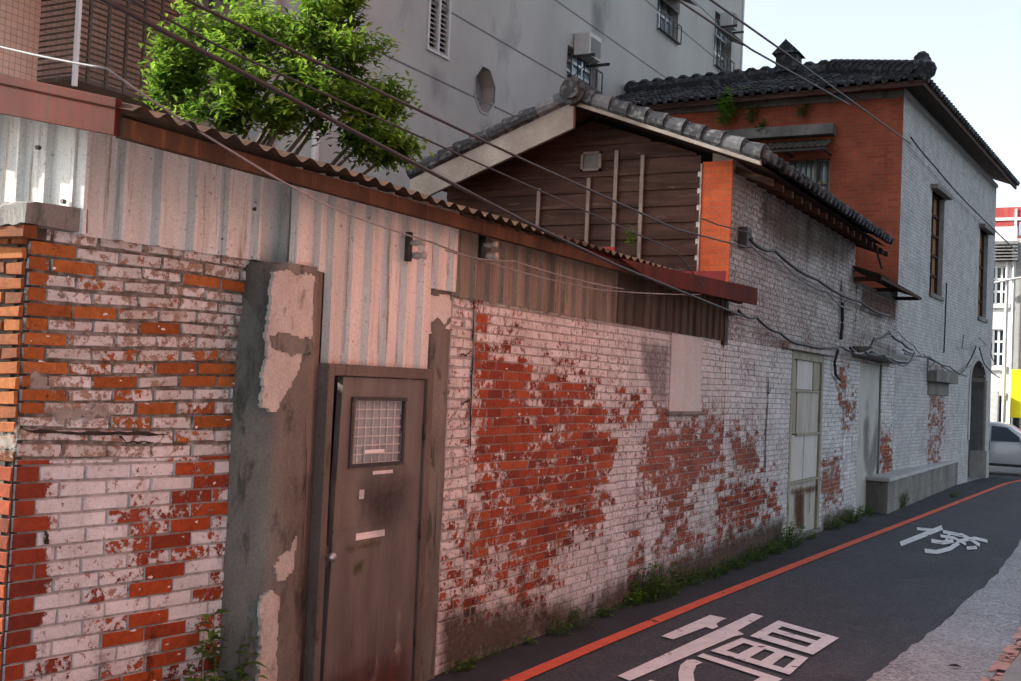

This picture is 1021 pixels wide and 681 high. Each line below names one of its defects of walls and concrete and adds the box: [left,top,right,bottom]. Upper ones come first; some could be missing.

peeling [20,241,245,443]
flaking render [258,270,315,412]
peeling [429,294,457,337]
peeling [4,460,71,681]
crack [23,429,169,444]
peeling [84,609,222,681]
peeling [86,455,230,603]
flaking render [273,536,297,581]
peeling [439,300,784,623]
water stain [444,519,784,670]
peeling [820,360,859,523]
peeling [925,395,948,465]